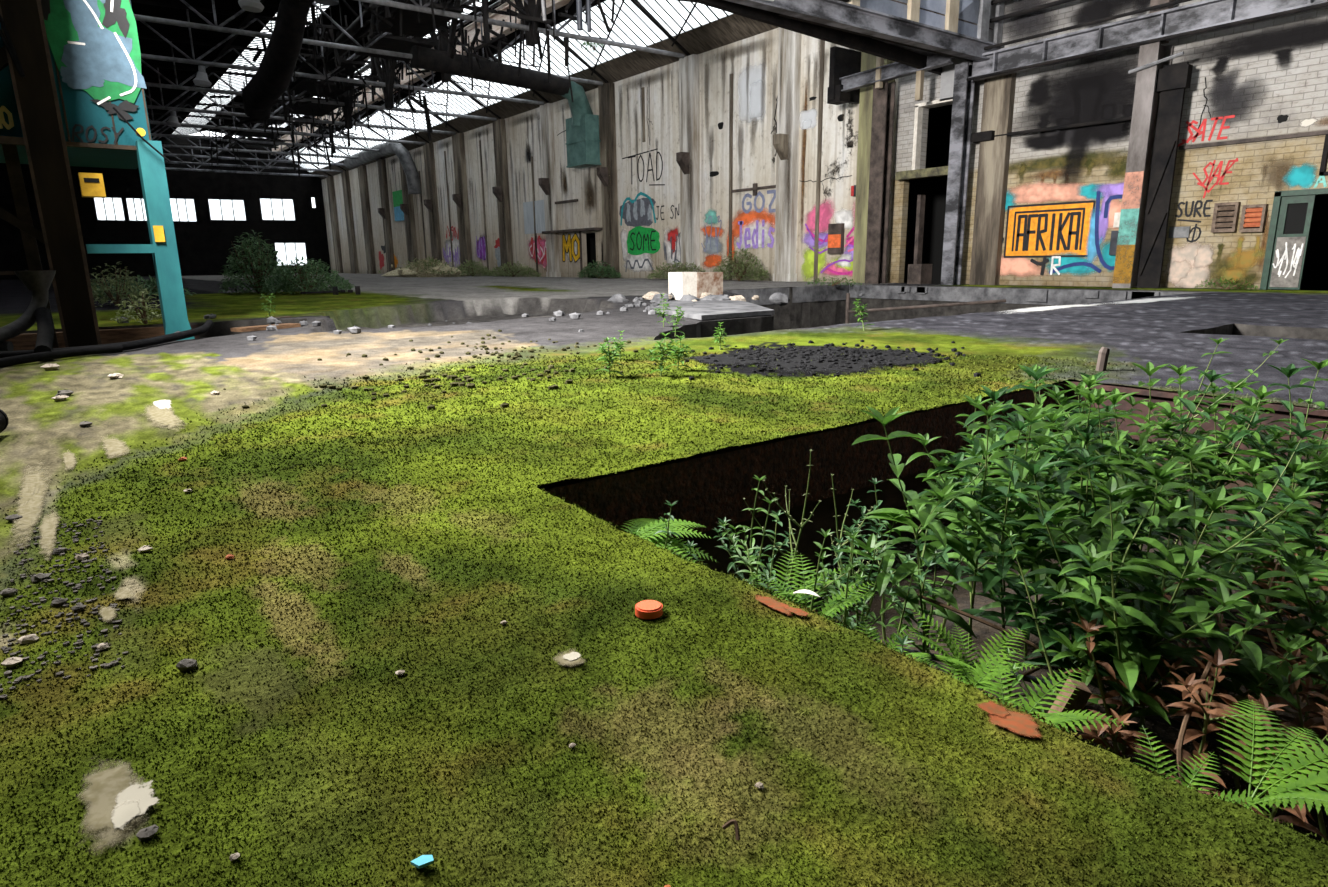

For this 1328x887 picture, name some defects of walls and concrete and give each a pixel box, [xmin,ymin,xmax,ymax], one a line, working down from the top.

damp [1212,56,1228,78]
damp [1039,79,1133,184]